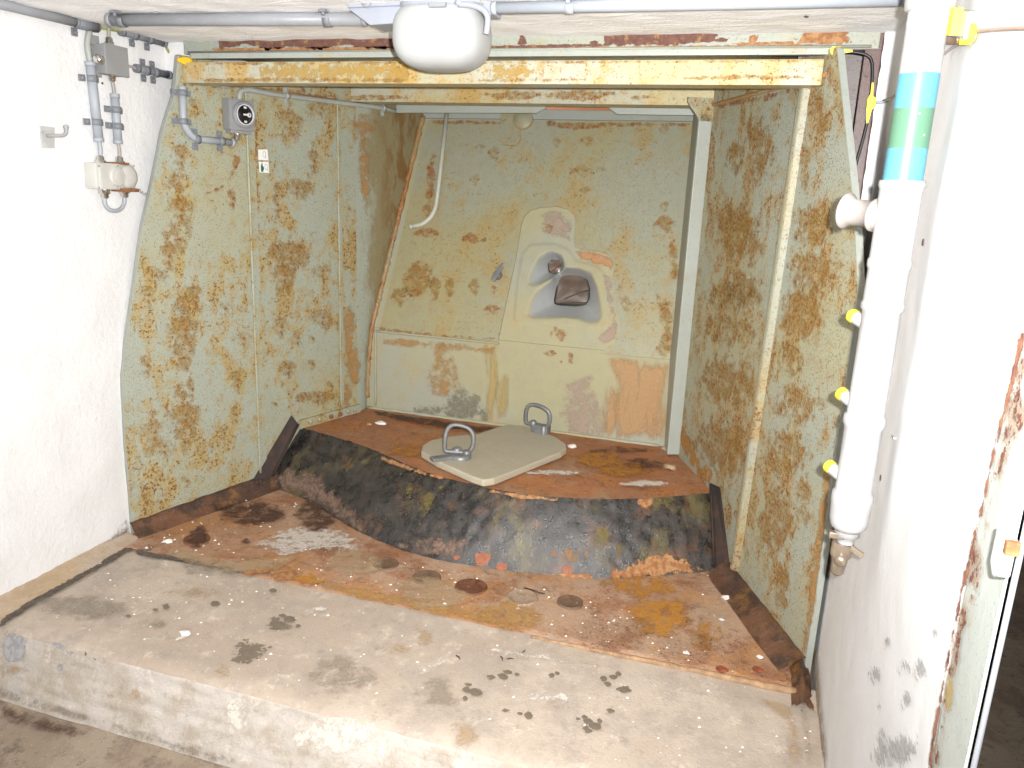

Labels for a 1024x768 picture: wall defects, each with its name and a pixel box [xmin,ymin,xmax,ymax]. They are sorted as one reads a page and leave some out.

corrosion [205,46,408,141]
corrosion [376,411,495,432]
corrosion [758,206,842,650]
corrosion [219,468,363,531]
corrosion [167,525,541,630]
water stain [266,613,302,630]
corrosion [558,553,748,666]
water stain [219,638,273,675]
water stain [425,680,483,703]
water stain [487,670,520,680]
water stain [600,671,632,693]
water stain [576,708,615,734]